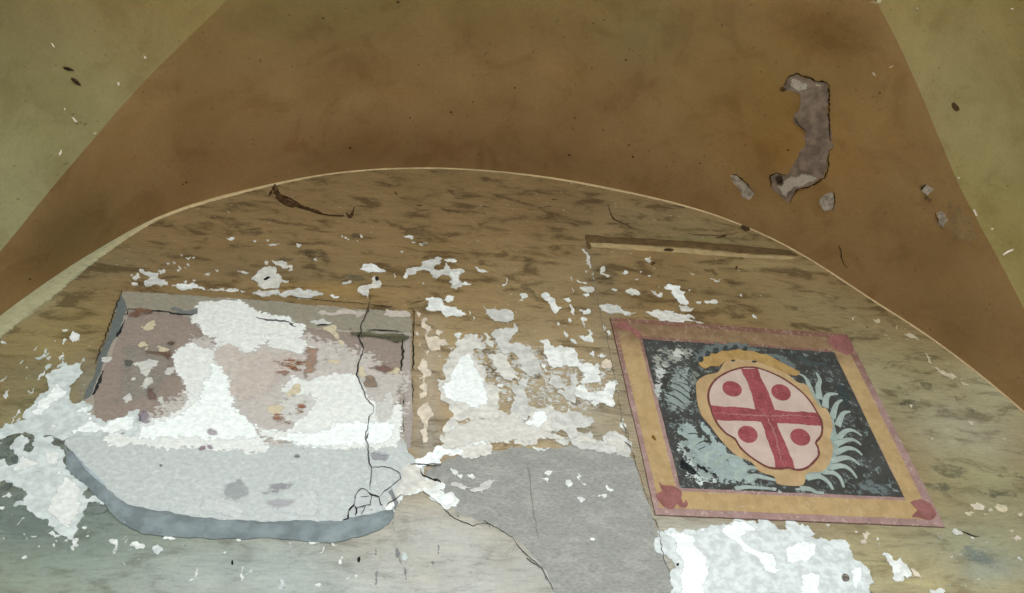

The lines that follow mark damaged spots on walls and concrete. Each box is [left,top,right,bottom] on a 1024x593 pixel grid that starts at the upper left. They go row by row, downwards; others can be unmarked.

flaking render [769,73,834,204]
flaking render [730,174,754,200]
flaking render [819,192,835,211]
peeling [0,249,719,551]
crack [297,296,552,586]
peeling [964,502,1023,517]
peeling [108,536,175,566]
peeling [654,519,923,593]